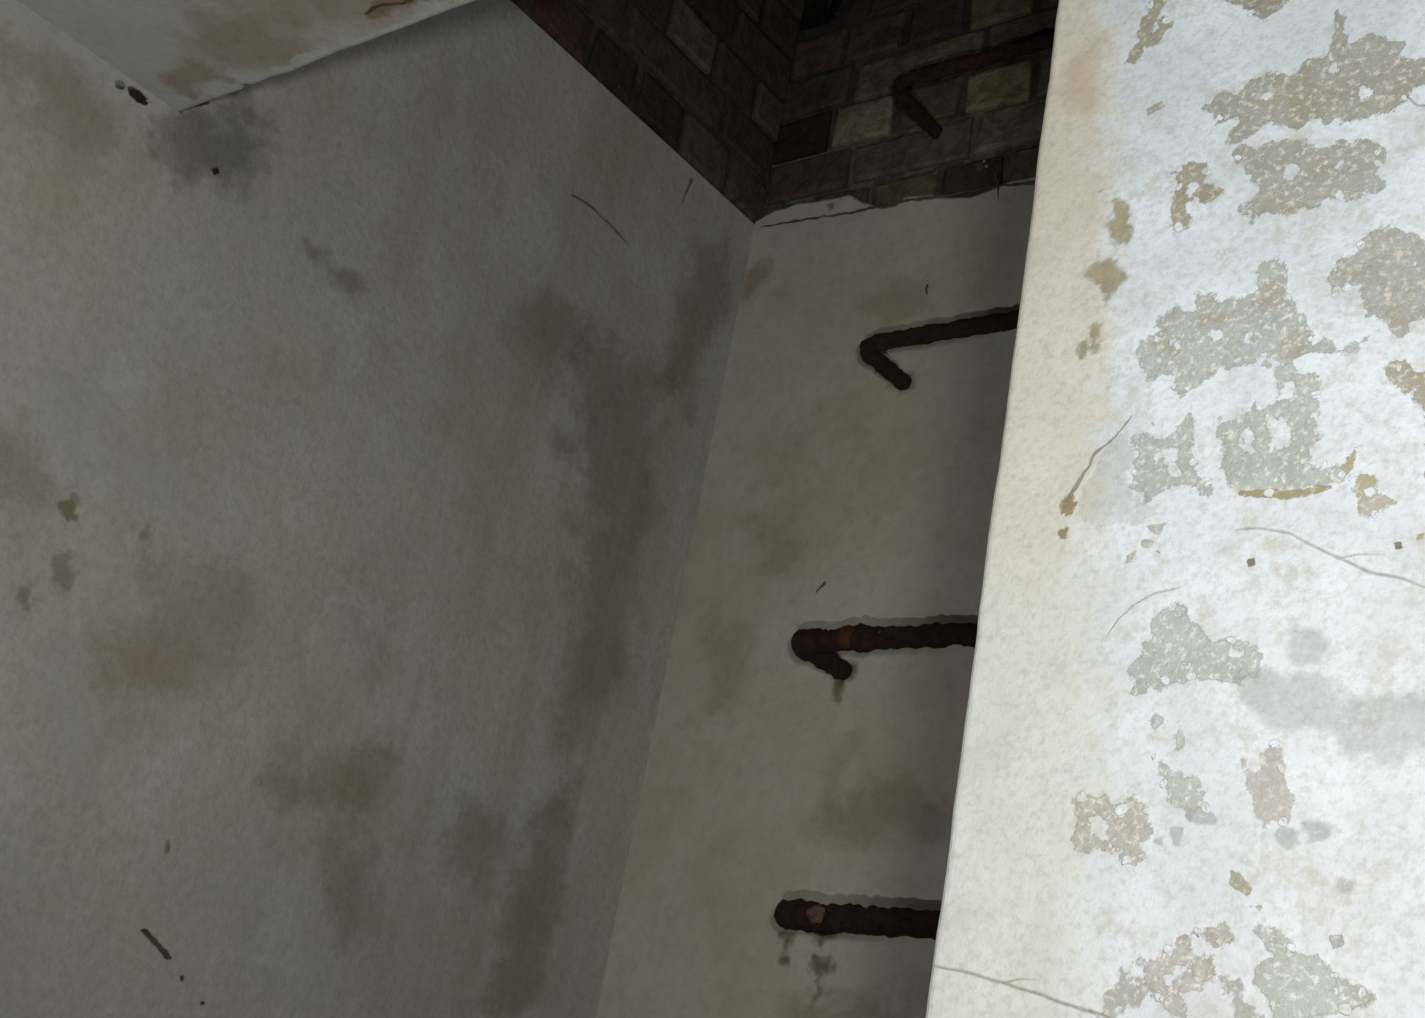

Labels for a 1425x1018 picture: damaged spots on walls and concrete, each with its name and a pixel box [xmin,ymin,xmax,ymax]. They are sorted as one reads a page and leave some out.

crack [365,0,412,15]
peeling [1201,9,1425,224]
peeling [1170,161,1224,232]
peeling [1328,225,1425,338]
peeling [1129,259,1397,518]
peeling [1385,359,1425,409]
rust [1058,494,1078,539]
peeling [1127,602,1263,697]
peeling [1241,739,1295,827]
peeling [1071,790,1154,866]
peeling [1103,870,1376,1018]
crack [933,965,1112,1018]